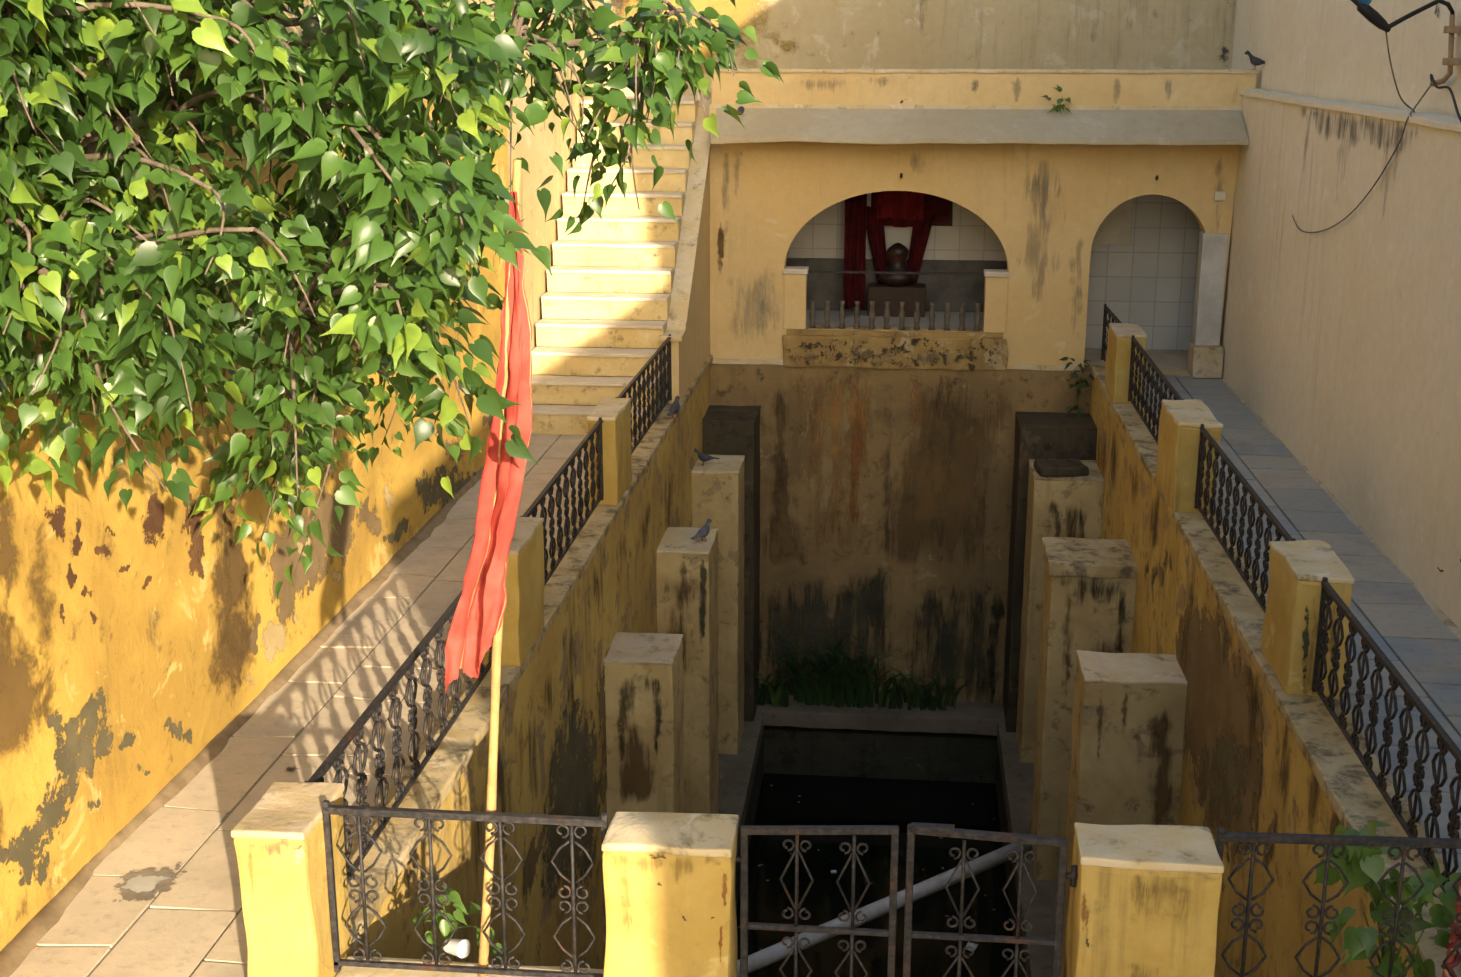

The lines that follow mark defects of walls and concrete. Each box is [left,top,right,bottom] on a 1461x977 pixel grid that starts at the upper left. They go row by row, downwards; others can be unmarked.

water stain [1316,109,1407,151]
spalling [45,505,130,624]
spalling [142,493,204,580]
water stain [765,396,804,564]
water stain [802,379,878,544]
water stain [867,570,890,654]
water stain [885,379,1003,562]
water stain [910,588,1004,703]
peeling [0,687,136,886]
peeling [164,717,192,744]
water stain [618,681,663,801]
water stain [1152,713,1172,825]